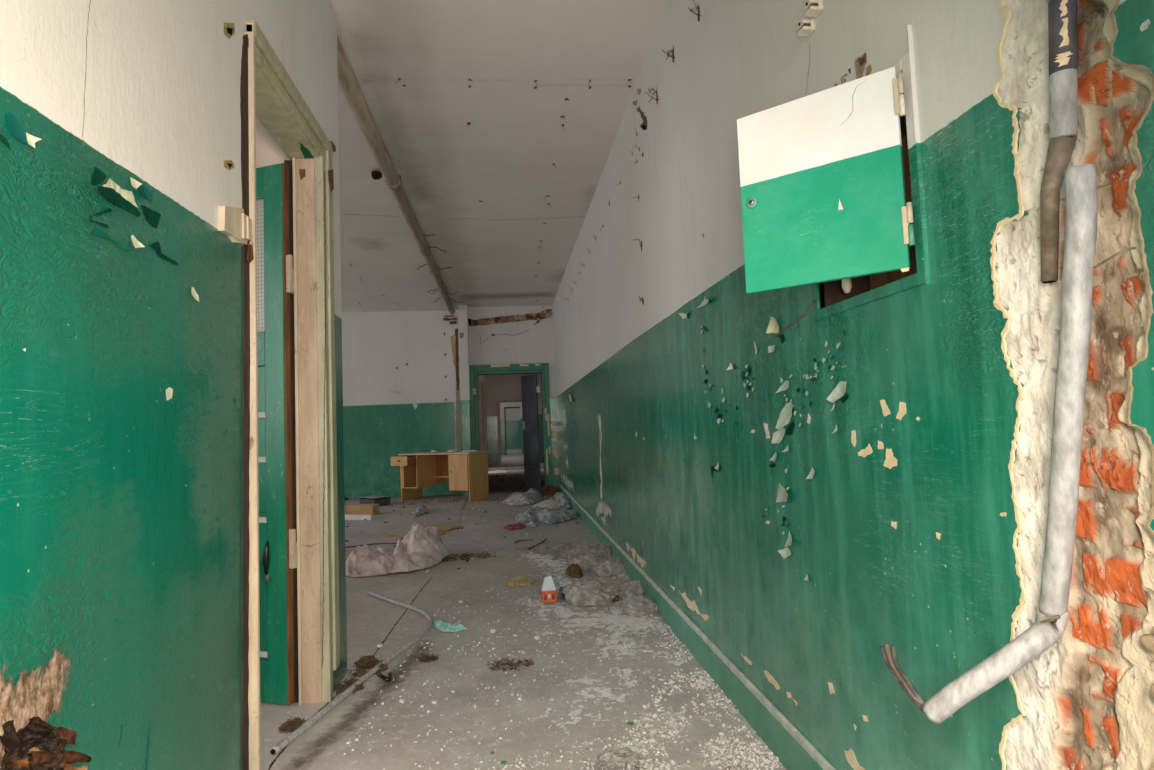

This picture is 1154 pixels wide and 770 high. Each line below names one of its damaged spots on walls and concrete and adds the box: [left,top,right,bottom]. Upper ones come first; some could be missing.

peeling [0,113,41,149]
peeling [89,167,179,265]
peeling [702,316,785,425]
peeling [880,399,920,421]
flaking render [990,0,1154,770]
peeling [751,329,848,559]
peeling [832,424,897,469]
peeling [625,541,646,567]
peeling [670,584,709,621]
peeling [741,653,798,706]
spalling [0,716,75,770]
peeling [845,748,865,770]